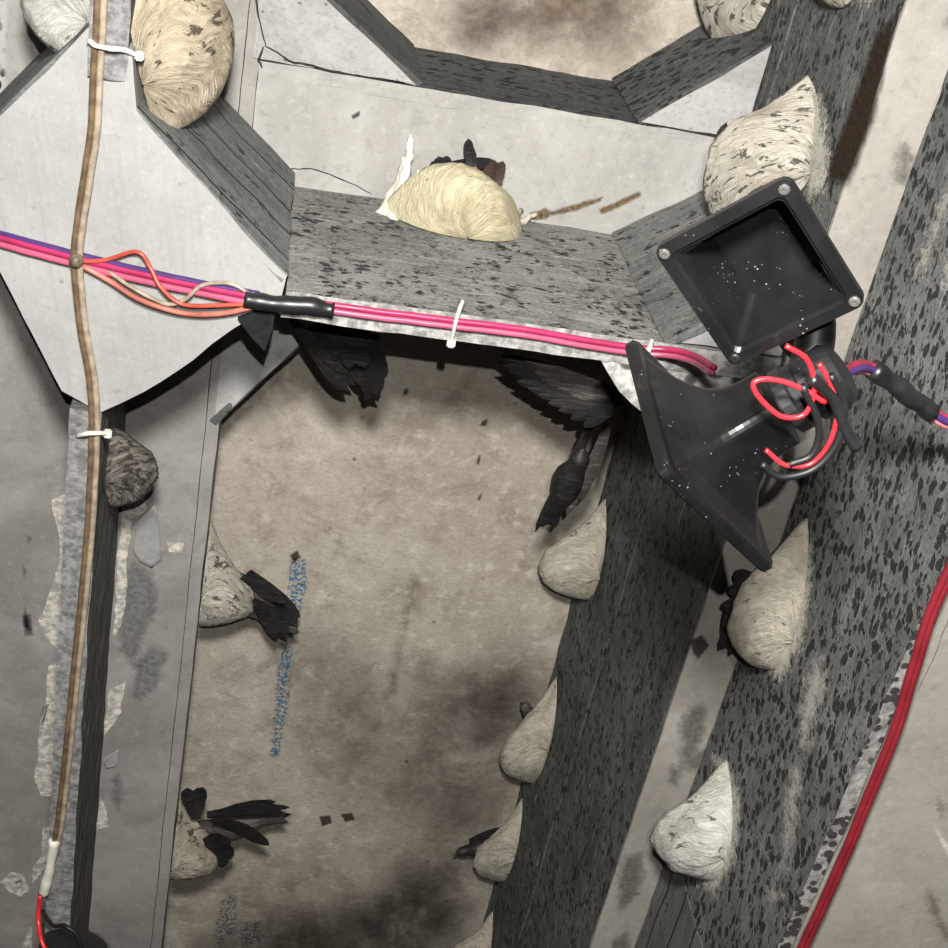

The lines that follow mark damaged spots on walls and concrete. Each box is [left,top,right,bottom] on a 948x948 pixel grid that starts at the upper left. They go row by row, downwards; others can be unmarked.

water stain [484,0,619,38]
peeling [39,494,66,650]
peeling [113,497,184,636]
peeling [34,663,57,797]
peeling [104,682,126,737]
peeling [96,797,109,830]
water stain [320,813,354,826]